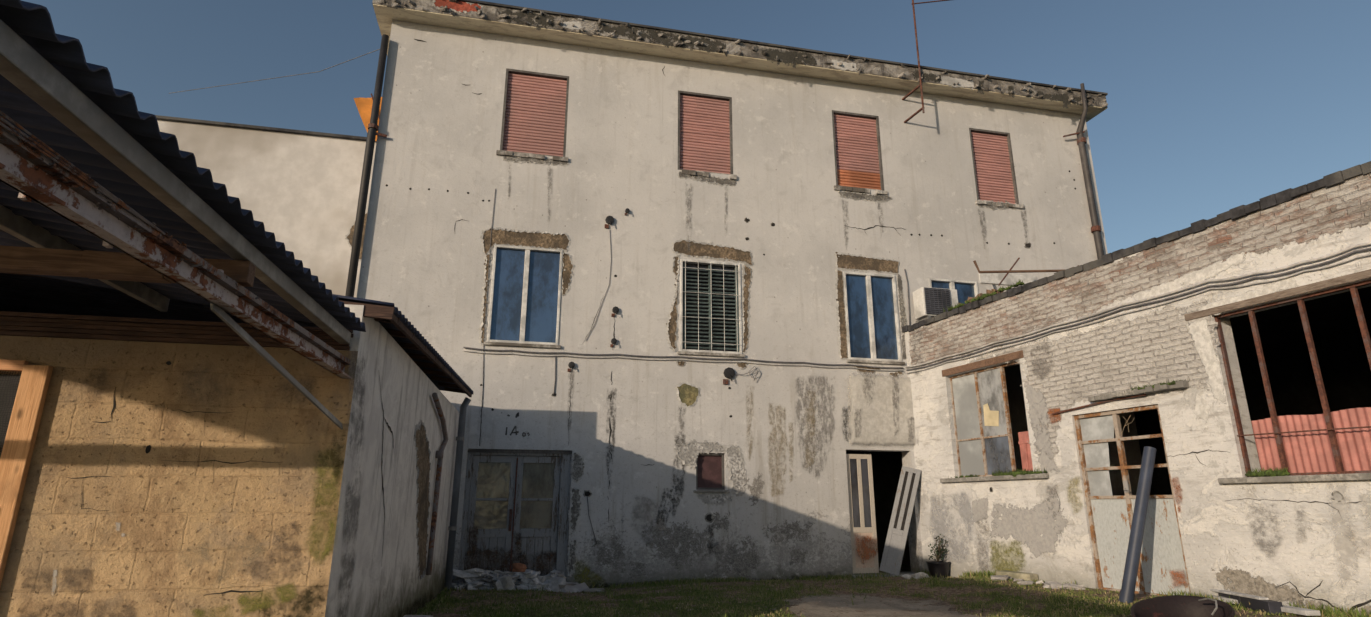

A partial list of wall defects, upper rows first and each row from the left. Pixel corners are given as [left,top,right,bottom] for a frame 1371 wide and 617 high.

spalling [378,0,871,75]
spalling [889,63,1108,108]
flaking render [478,227,576,345]
flaking render [666,217,765,409]
flaking render [834,173,1371,474]
flaking render [566,439,815,580]
flaking render [972,487,1068,559]
crack [1276,580,1371,611]